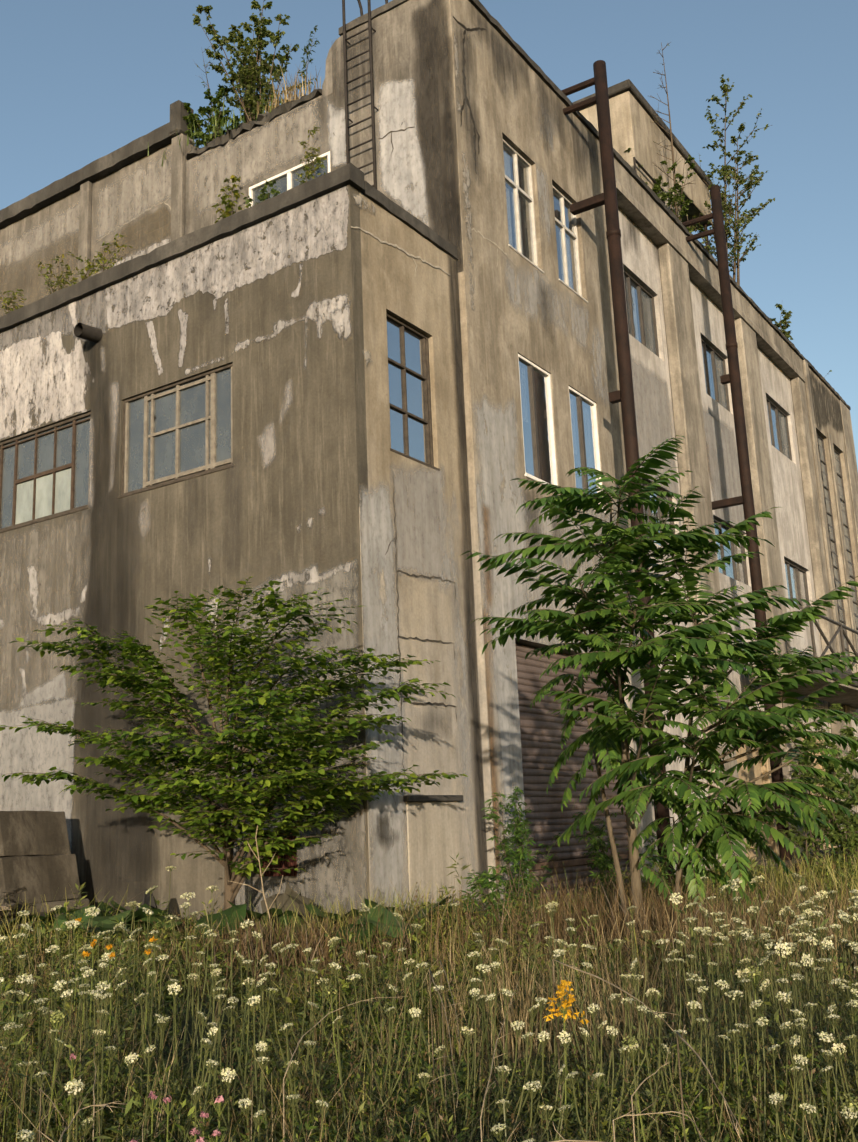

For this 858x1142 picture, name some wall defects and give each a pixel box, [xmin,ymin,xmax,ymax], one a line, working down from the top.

crack [453,16,485,63]
crack [460,91,480,174]
peeling [105,186,375,376]
peeling [0,301,95,439]
water stain [414,0,489,896]
peeling [20,565,87,707]
crack [385,478,457,792]